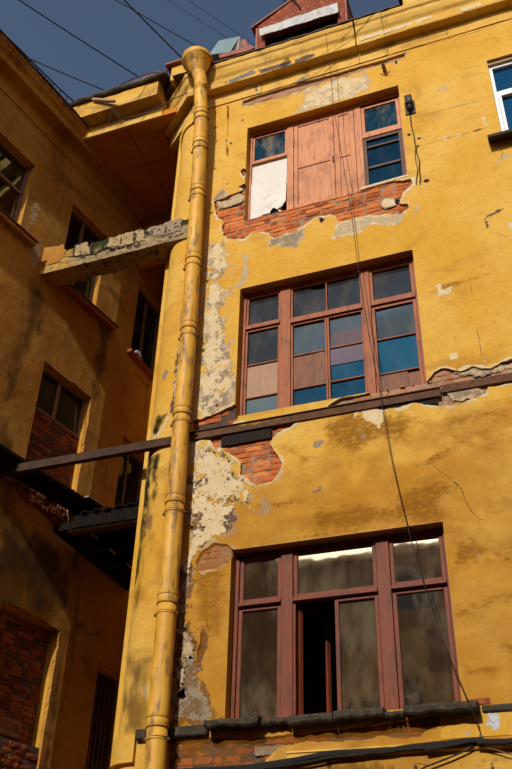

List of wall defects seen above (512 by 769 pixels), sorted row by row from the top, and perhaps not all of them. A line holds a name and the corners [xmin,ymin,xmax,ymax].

peeling [241,51,407,114]
peeling [28,242,93,266]
spalling [107,218,182,247]
spalling [326,353,512,428]
spalling [169,170,430,727]
leakage [327,414,406,446]
leakage [136,452,159,577]
leakage [316,482,446,526]
crack [436,468,483,527]